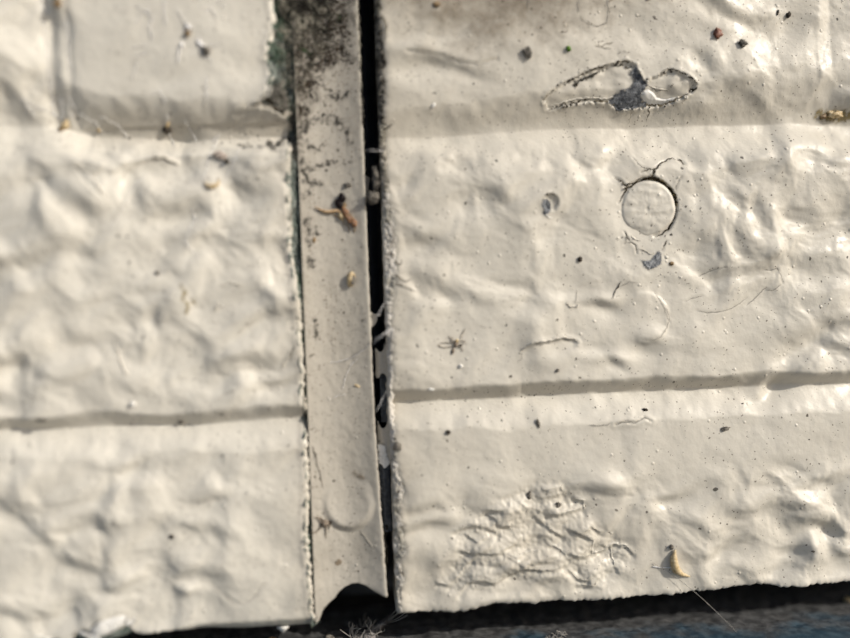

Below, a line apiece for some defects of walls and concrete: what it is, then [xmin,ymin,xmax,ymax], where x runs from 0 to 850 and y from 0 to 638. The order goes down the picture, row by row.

damp [238,0,358,200]
peeling [544,51,698,122]
spalling [542,191,558,218]
damp [303,217,322,269]
spalling [641,251,662,270]
spalling [71,615,137,638]